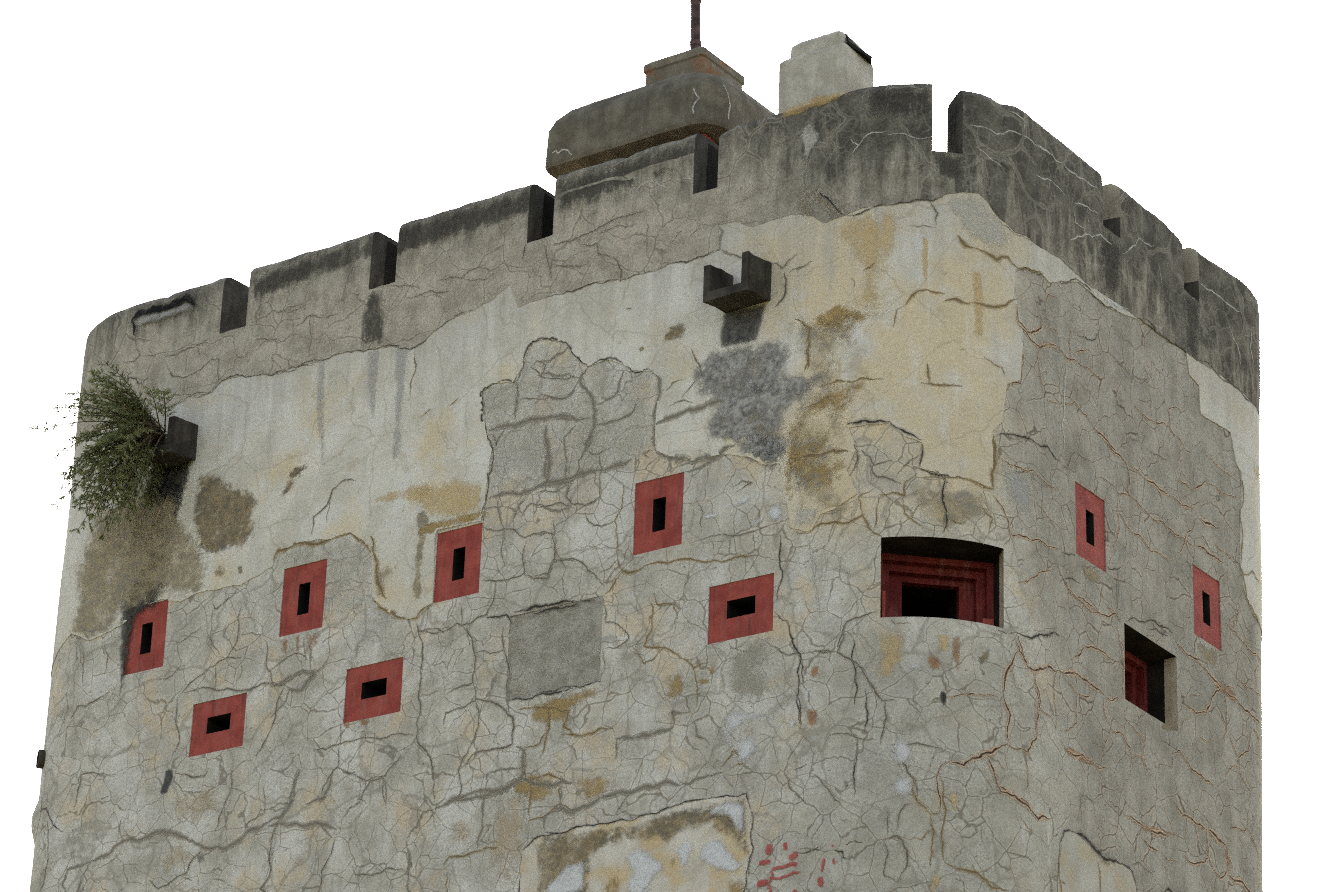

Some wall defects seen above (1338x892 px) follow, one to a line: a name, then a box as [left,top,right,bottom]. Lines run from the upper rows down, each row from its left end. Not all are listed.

water stain [694,306,829,466]
water stain [73,462,256,687]
water stain [538,802,745,892]